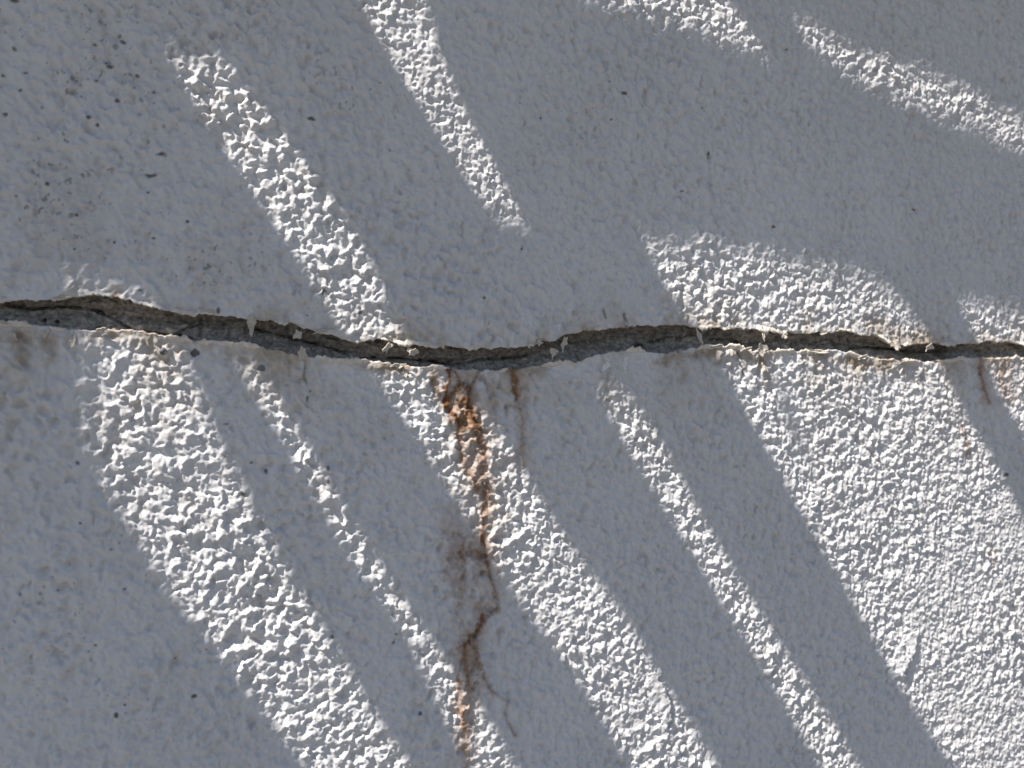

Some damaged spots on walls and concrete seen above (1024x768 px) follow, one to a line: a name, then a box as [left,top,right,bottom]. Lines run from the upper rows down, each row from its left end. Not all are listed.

crack [0,294,1024,377]
corrosion [443,368,485,460]